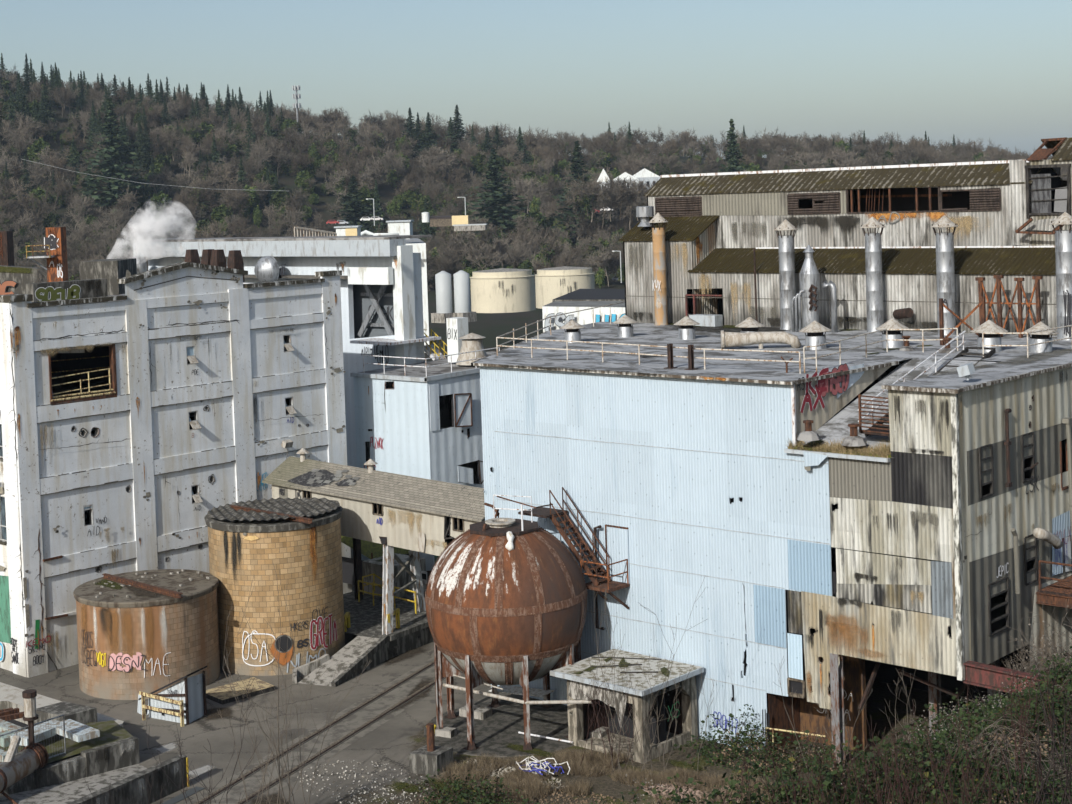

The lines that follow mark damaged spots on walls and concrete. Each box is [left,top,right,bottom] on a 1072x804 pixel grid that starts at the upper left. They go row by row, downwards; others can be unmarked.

water stain [941,400,963,428]
peeling [306,469,360,484]
water stain [224,532,241,573]